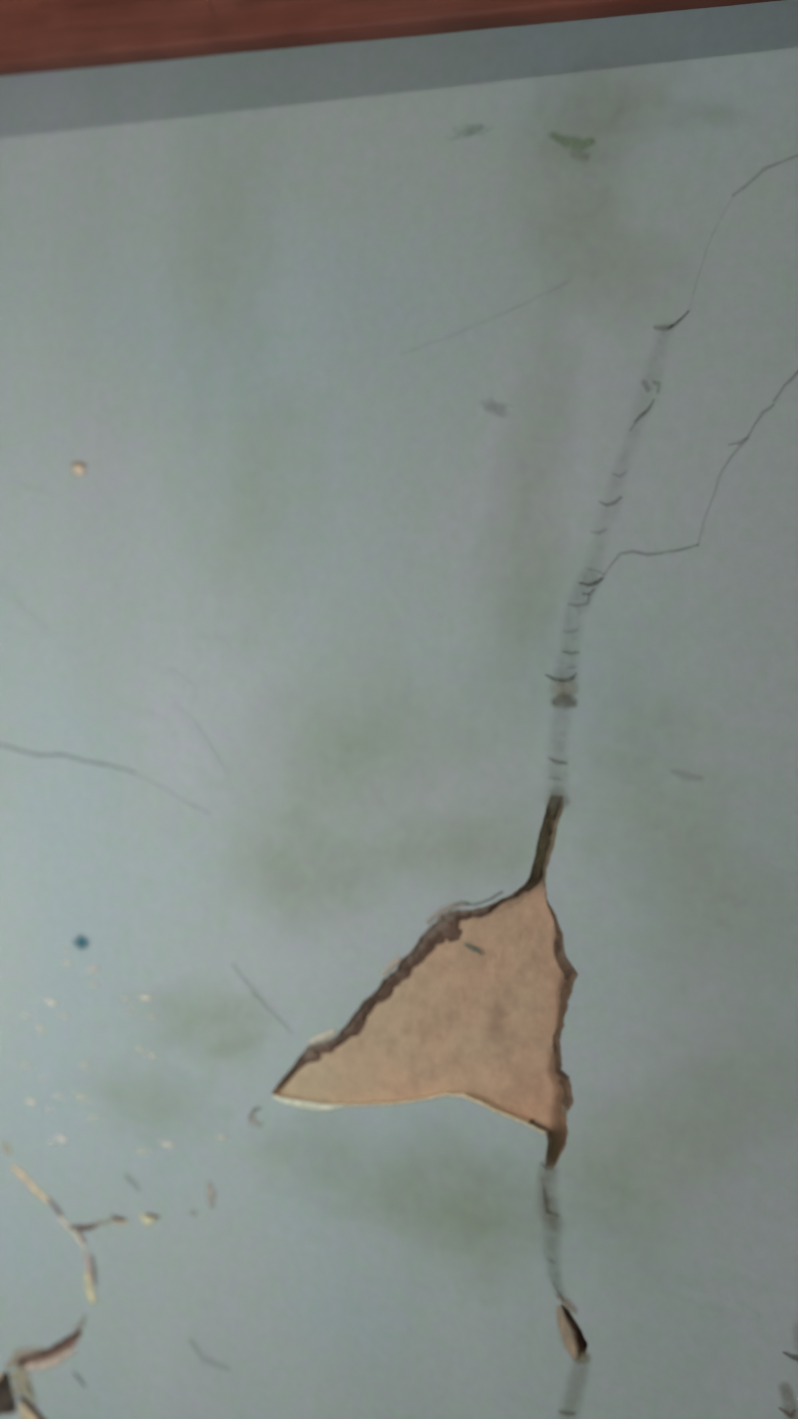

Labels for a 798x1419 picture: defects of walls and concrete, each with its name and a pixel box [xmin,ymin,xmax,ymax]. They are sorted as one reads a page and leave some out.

crack [553,676,575,706]
crack [519,795,564,892]
flaking render [270,872,578,1163]
crack [531,1104,568,1169]
spalling [0,1329,83,1419]
crack [557,1300,588,1360]